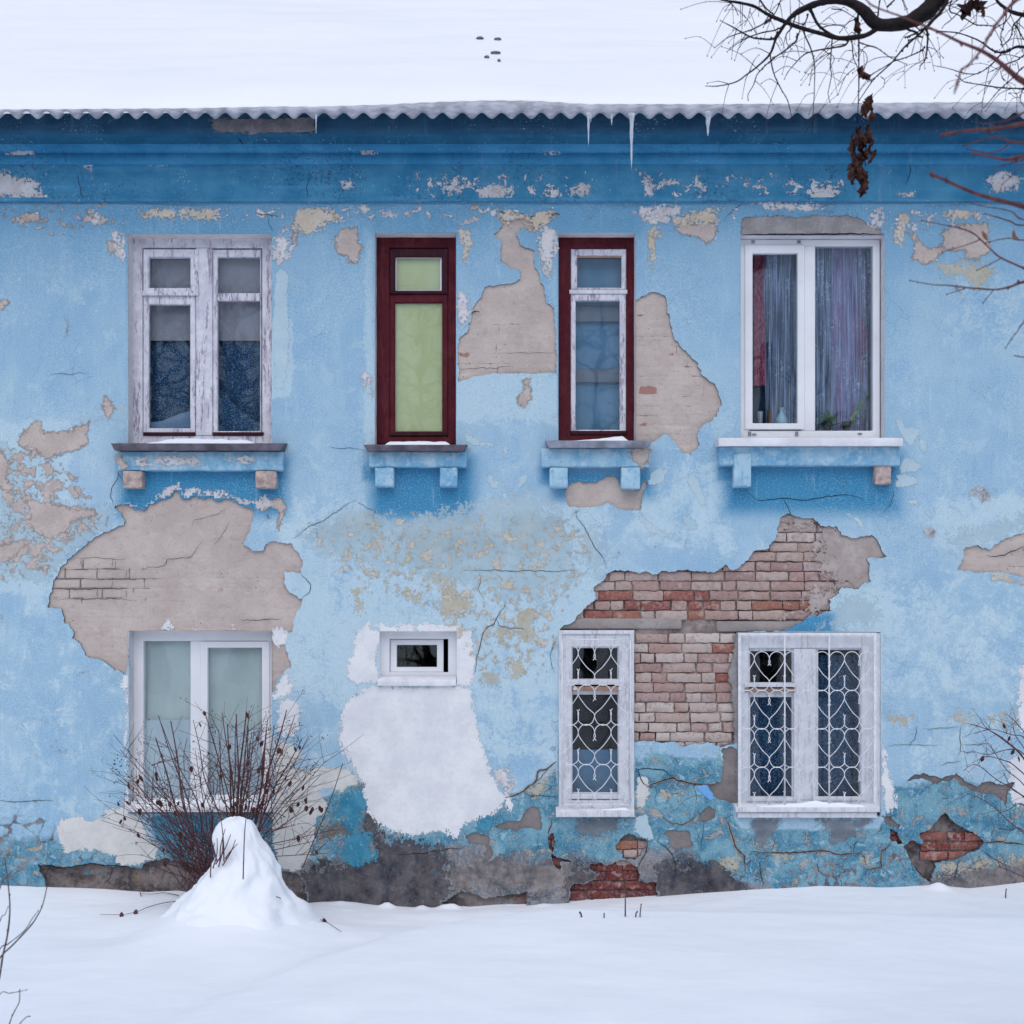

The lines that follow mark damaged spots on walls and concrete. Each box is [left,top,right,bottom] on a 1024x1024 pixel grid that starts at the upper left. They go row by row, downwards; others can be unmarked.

peeling [625,165,844,270]
peeling [866,170,1024,291]
spalling [136,171,595,408]
crack [750,493,860,514]
peeling [0,292,886,822]
crack [471,569,576,670]
crack [635,768,710,787]
damp [299,813,459,908]
peeling [443,767,693,907]
crack [638,816,891,886]
spalling [882,813,1024,888]
crack [983,840,1024,867]